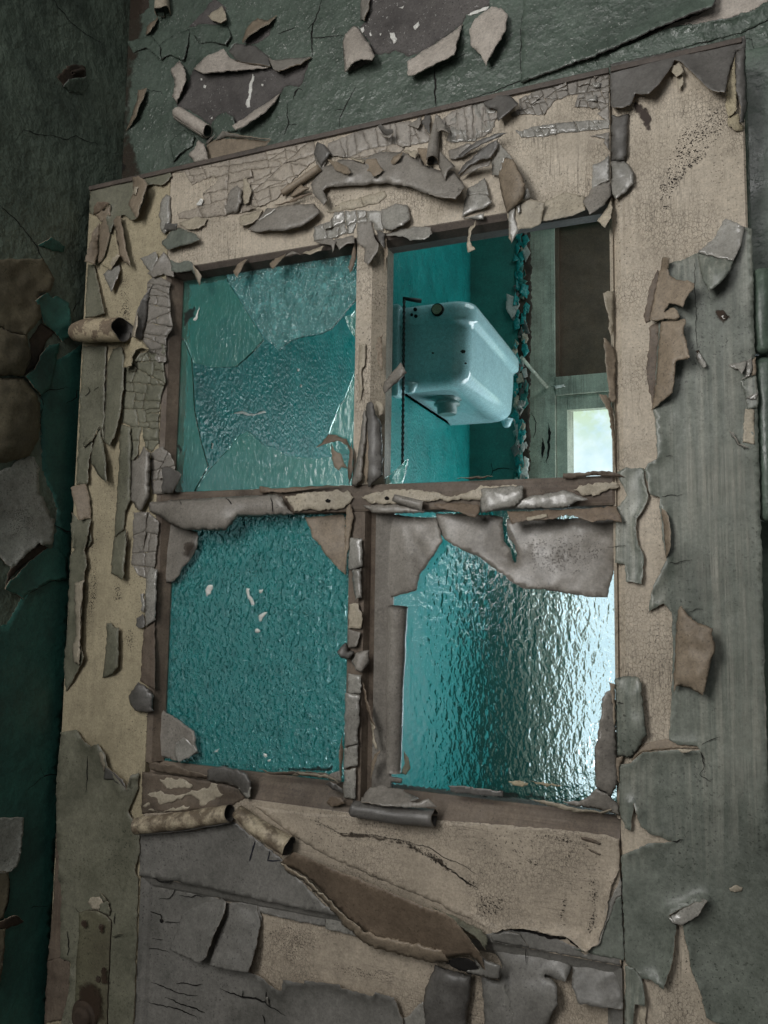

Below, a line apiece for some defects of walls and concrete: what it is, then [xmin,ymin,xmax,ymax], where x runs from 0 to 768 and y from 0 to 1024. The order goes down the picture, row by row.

spalling [126,0,312,162]
spalling [343,0,508,76]
crack [175,0,710,230]
peeling [520,0,768,131]
peeling [84,173,172,318]
peeling [158,194,200,250]
peeling [239,95,613,479]
peeling [0,219,768,1024]
crack [302,816,625,952]